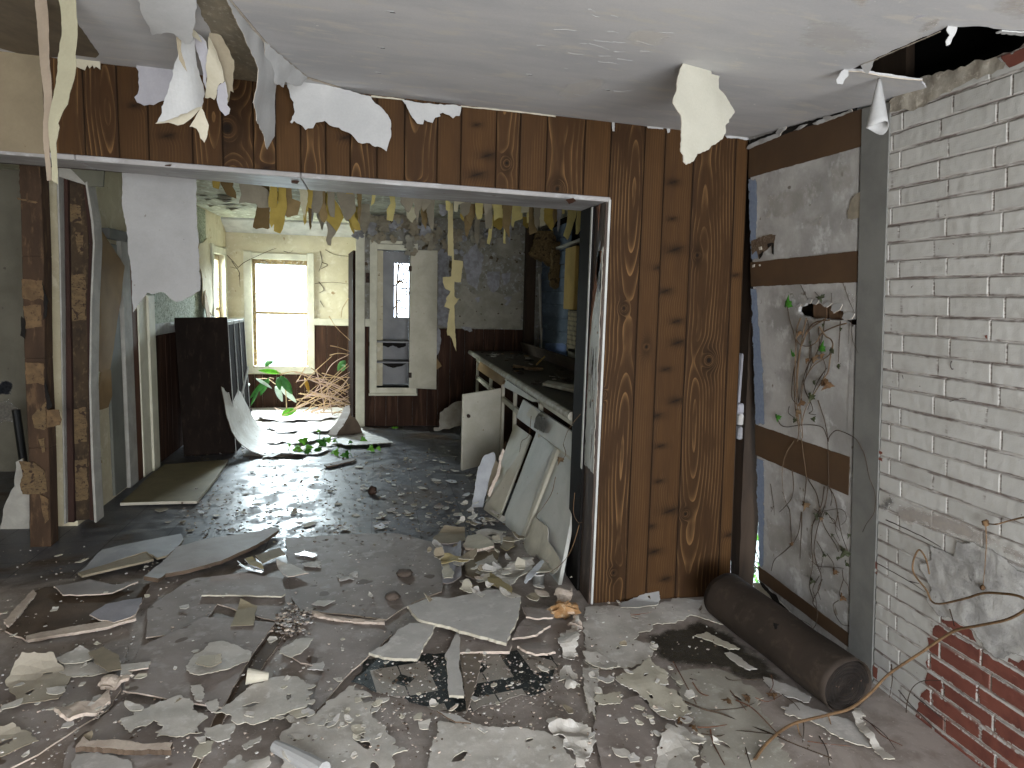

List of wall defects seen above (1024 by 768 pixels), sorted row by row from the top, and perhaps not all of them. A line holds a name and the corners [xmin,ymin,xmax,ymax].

peeling [192,0,258,116]
peeling [945,26,957,46]
peeling [996,44,1024,68]
peeling [135,65,173,106]
peeling [402,100,461,124]
peeling [647,63,862,178]
peeling [562,198,581,240]
peeling [198,181,546,350]
spalling [796,298,855,320]
damp [649,622,780,679]
peeling [915,617,1024,768]